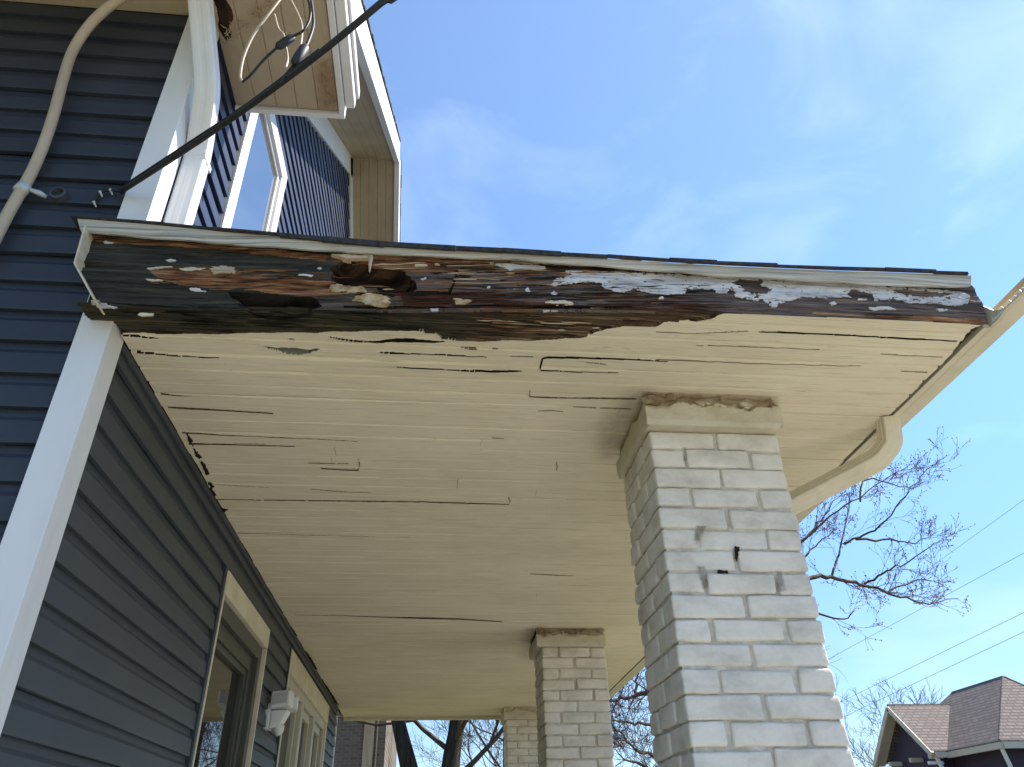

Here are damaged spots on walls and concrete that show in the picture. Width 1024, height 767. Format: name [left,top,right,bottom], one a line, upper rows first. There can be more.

peeling [146,259,206,282]
spalling [228,291,322,320]
spalling [298,261,440,297]
peeling [490,262,546,271]
peeling [543,270,970,312]
crack [330,331,957,412]
spalling [645,394,752,410]
crack [161,393,511,505]
spalling [538,628,604,636]